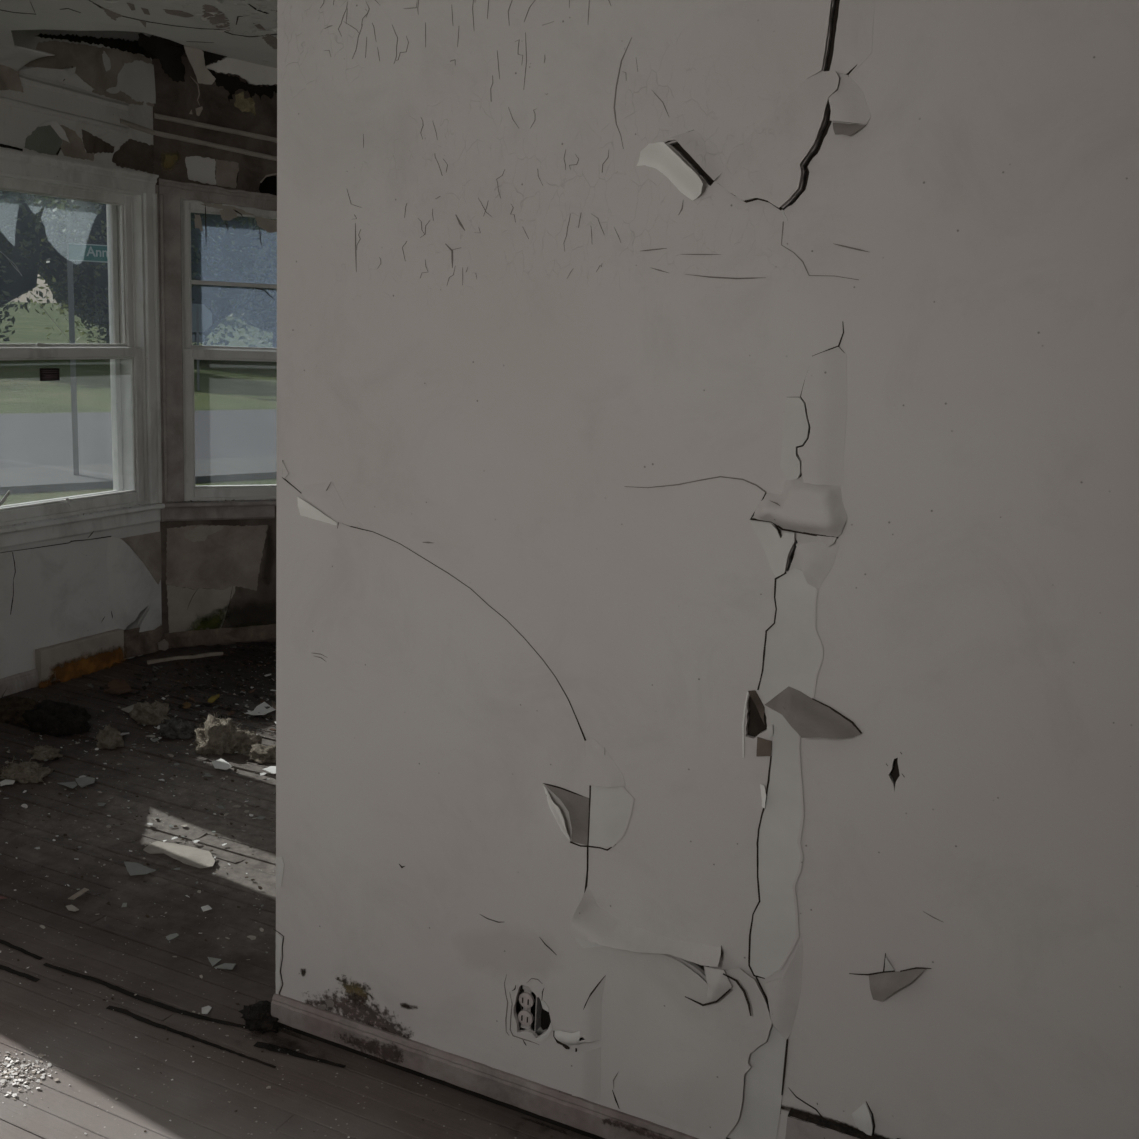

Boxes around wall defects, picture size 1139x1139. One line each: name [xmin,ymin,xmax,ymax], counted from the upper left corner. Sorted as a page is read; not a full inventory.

flaking render [0,40,156,107]
crack [320,0,611,128]
crack [347,118,529,285]
peeling [637,130,724,214]
crack [717,0,875,280]
crack [780,321,847,486]
peeling [106,525,268,651]
crack [282,460,626,787]
peeling [543,783,634,888]
peeling [625,521,862,1139]
leakage [306,977,418,1063]
leakage [602,1119,672,1139]